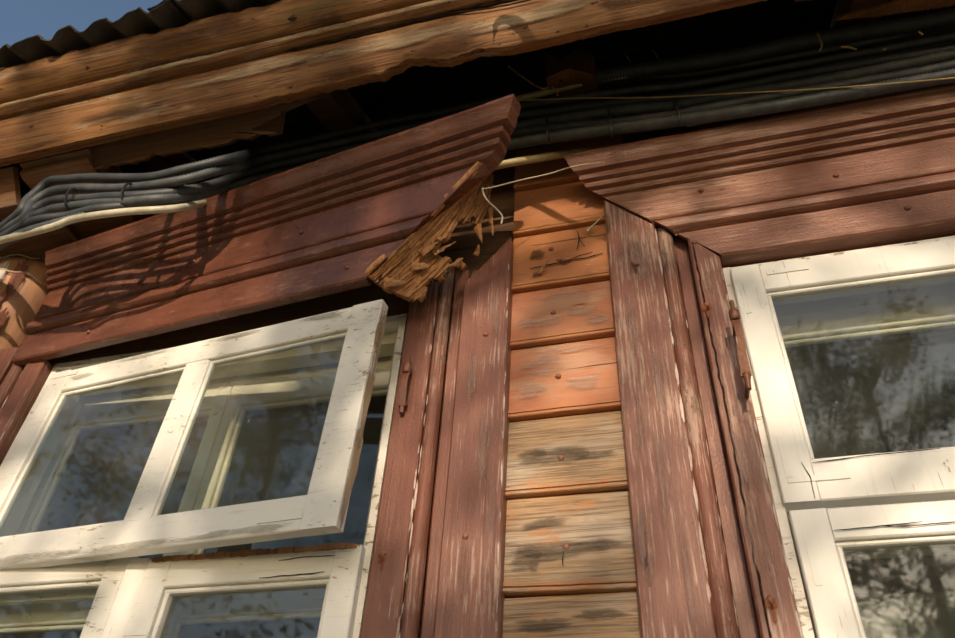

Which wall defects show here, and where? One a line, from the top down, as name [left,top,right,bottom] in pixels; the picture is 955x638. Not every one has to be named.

peeling [0,259,28,329]
peeling [652,351,685,422]
peeling [403,469,419,583]
peeling [685,435,711,603]